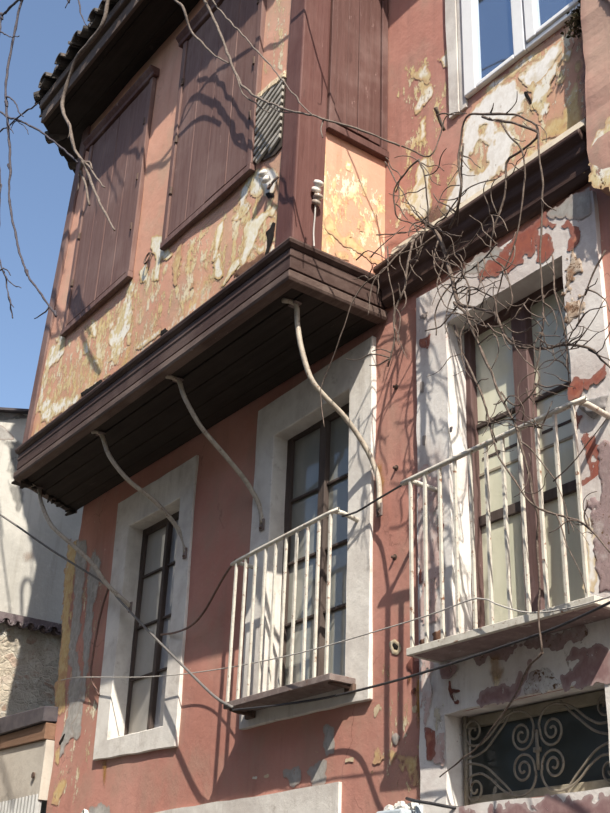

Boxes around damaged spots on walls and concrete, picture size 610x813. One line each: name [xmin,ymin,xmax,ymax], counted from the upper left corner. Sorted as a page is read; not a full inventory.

peeling [36,0,287,424]
peeling [322,17,586,265]
peeling [478,211,585,324]
peeling [588,163,610,191]
peeling [591,116,610,147]
flaking render [567,364,610,594]
peeling [54,539,101,730]
peeling [473,625,610,708]
peeling [51,739,90,806]
peeling [488,792,610,813]